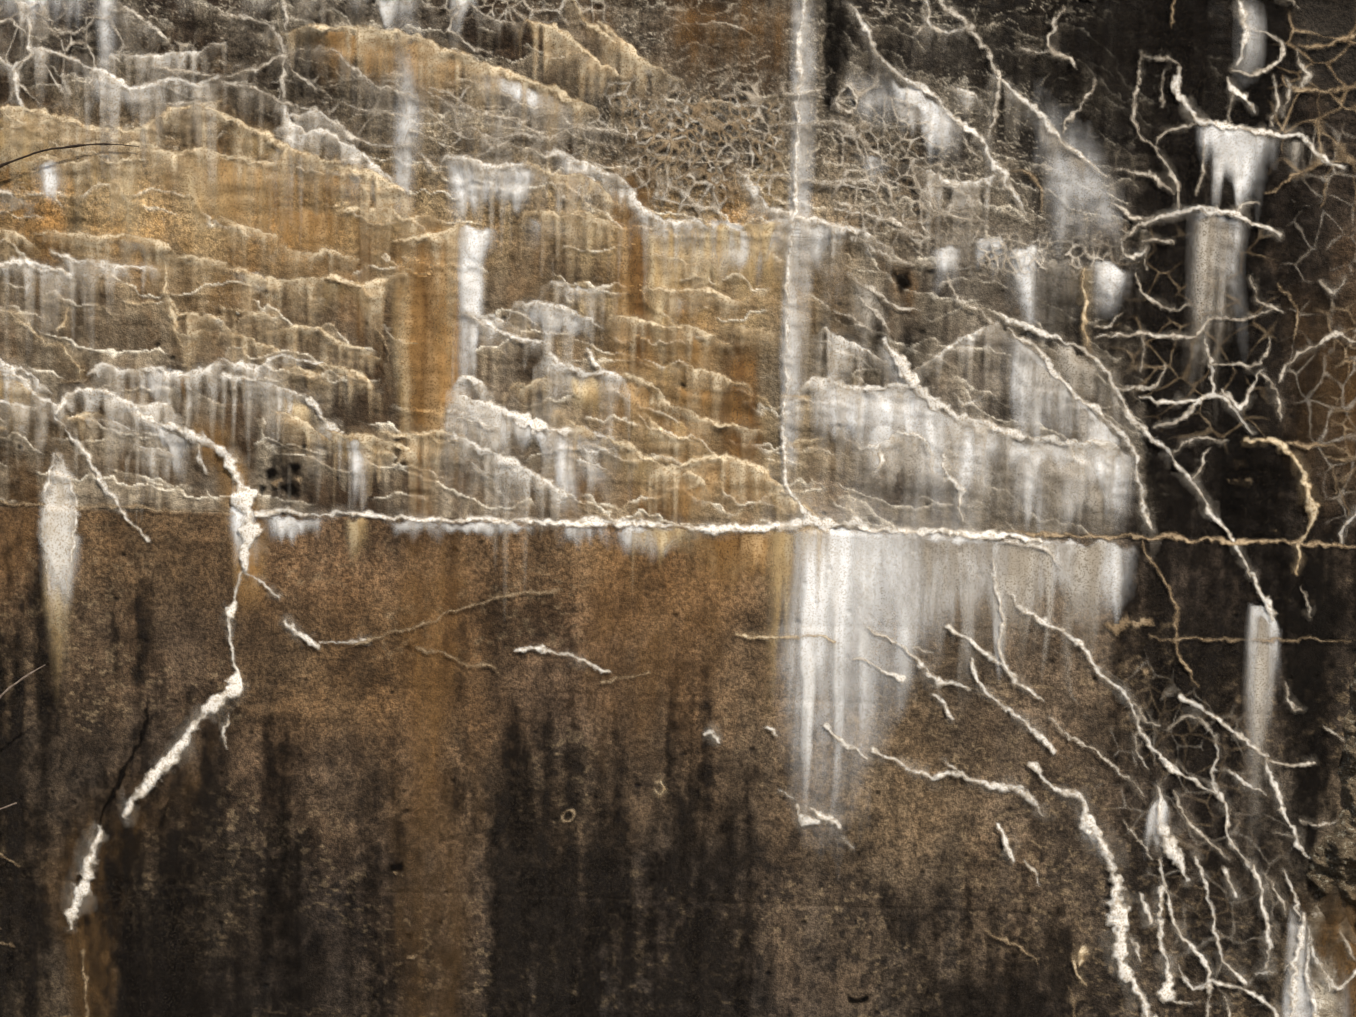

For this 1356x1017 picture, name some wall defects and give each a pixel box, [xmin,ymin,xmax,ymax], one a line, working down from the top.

crack [0,417,187,542]
efflorescence [0,57,488,355]
crack [0,0,784,210]
rust [399,229,464,499]
rust [618,199,777,363]
rust [669,348,766,510]
crack [736,0,1356,1017]
leakage [1114,0,1356,1017]
crack [65,574,650,1017]
leakage [474,701,757,1017]
leakage [796,804,841,829]
spalling [1306,662,1356,907]